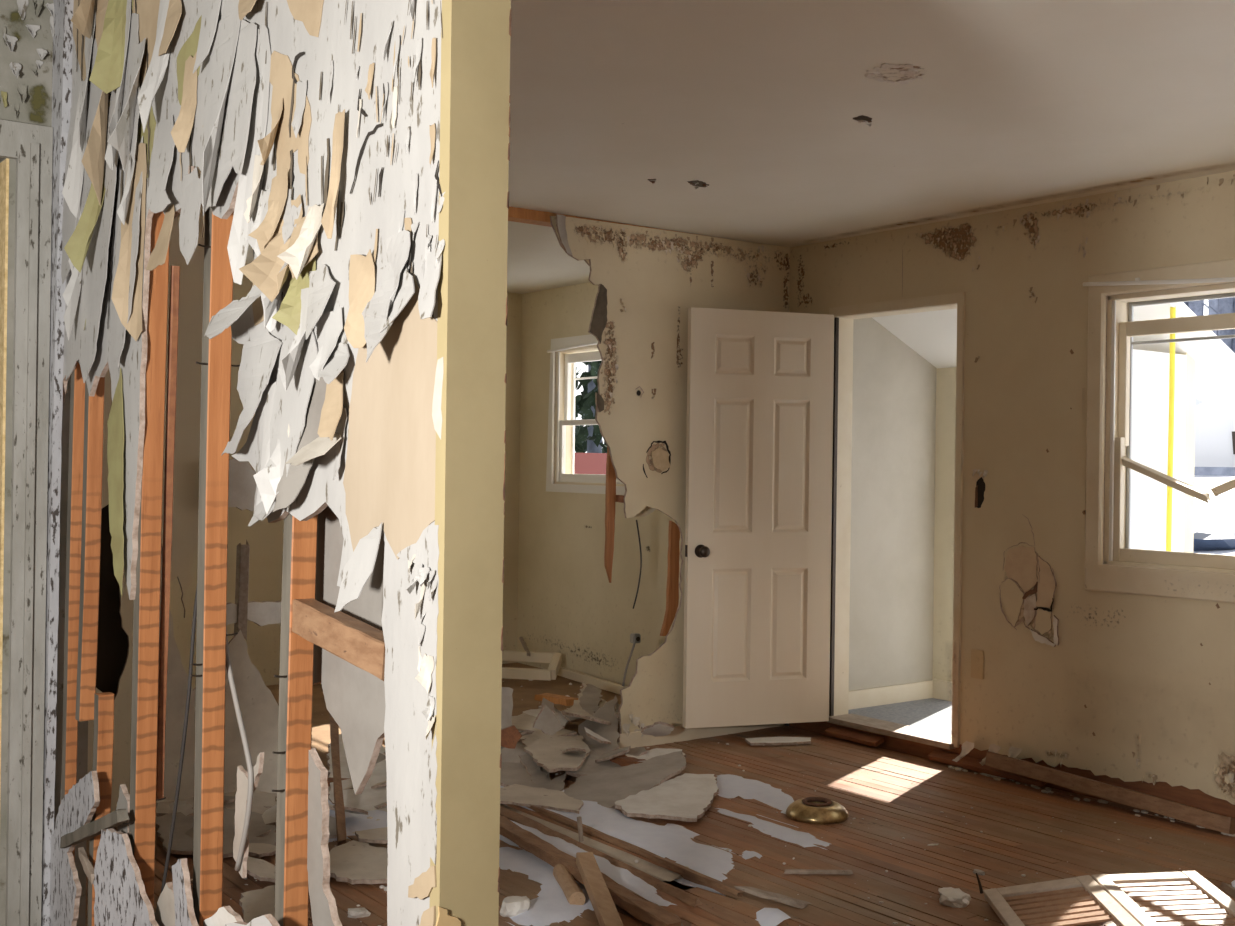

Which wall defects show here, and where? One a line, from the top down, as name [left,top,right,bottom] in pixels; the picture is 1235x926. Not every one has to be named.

peeling [576,225,729,271]
peeling [600,298,626,415]
peeling [61,0,445,866]
spalling [643,440,671,478]
spalling [972,469,988,508]